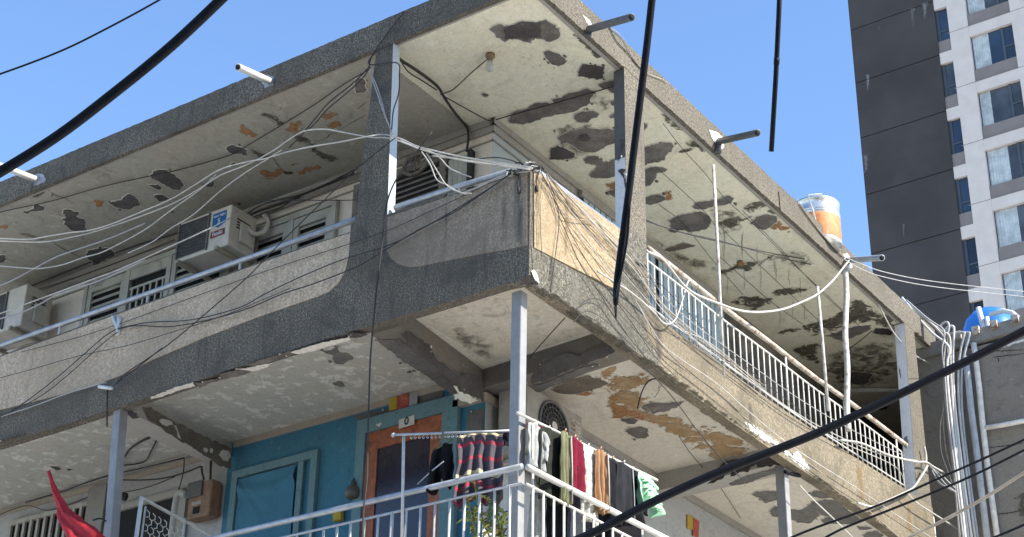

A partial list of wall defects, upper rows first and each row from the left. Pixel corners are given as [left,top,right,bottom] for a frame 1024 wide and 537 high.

rust [322,112,342,129]
peeling [489,19,627,198]
peeling [61,208,88,232]
peeling [108,193,142,211]
peeling [146,169,185,213]
peeling [663,194,737,252]
peeling [825,324,893,342]
peeling [840,355,878,385]
peeling [127,331,484,469]
peeling [620,400,685,441]
rust [576,367,748,460]